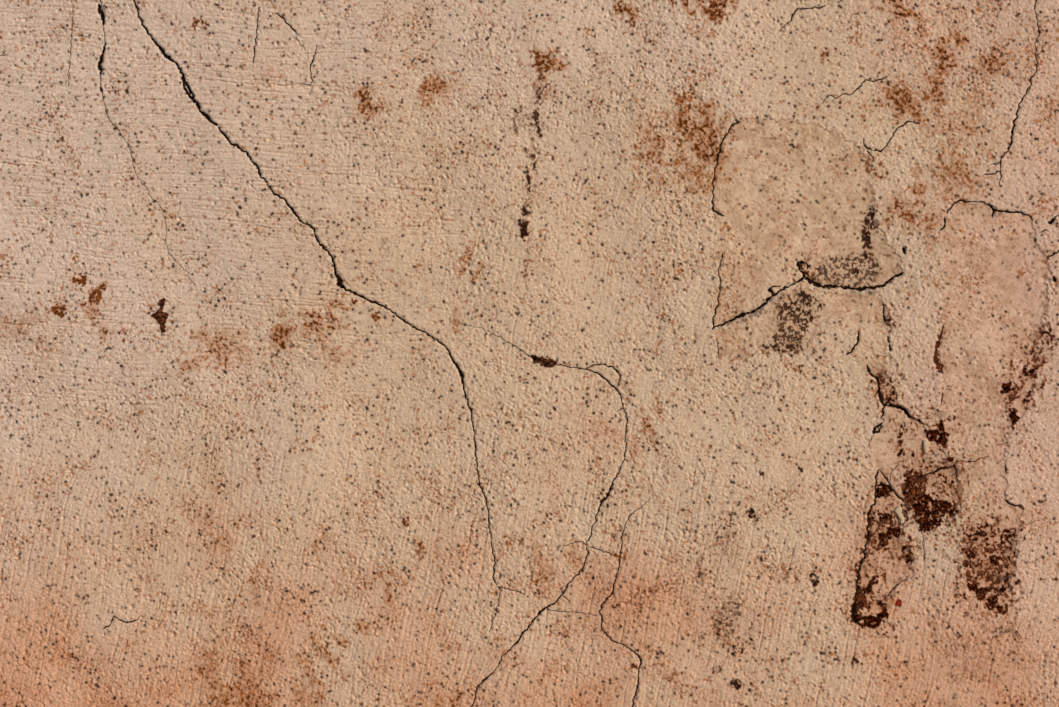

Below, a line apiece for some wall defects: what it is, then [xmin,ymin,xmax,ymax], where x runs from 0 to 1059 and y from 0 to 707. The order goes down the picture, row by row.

corrosion [671,0,734,24]
crack [68,0,195,285]
corrosion [635,77,734,193]
crack [711,121,740,216]
crack [822,76,887,104]
crack [863,121,920,162]
crack [940,1,1059,283]
crack [133,0,650,707]
spalling [710,116,1059,637]
crack [103,615,140,629]